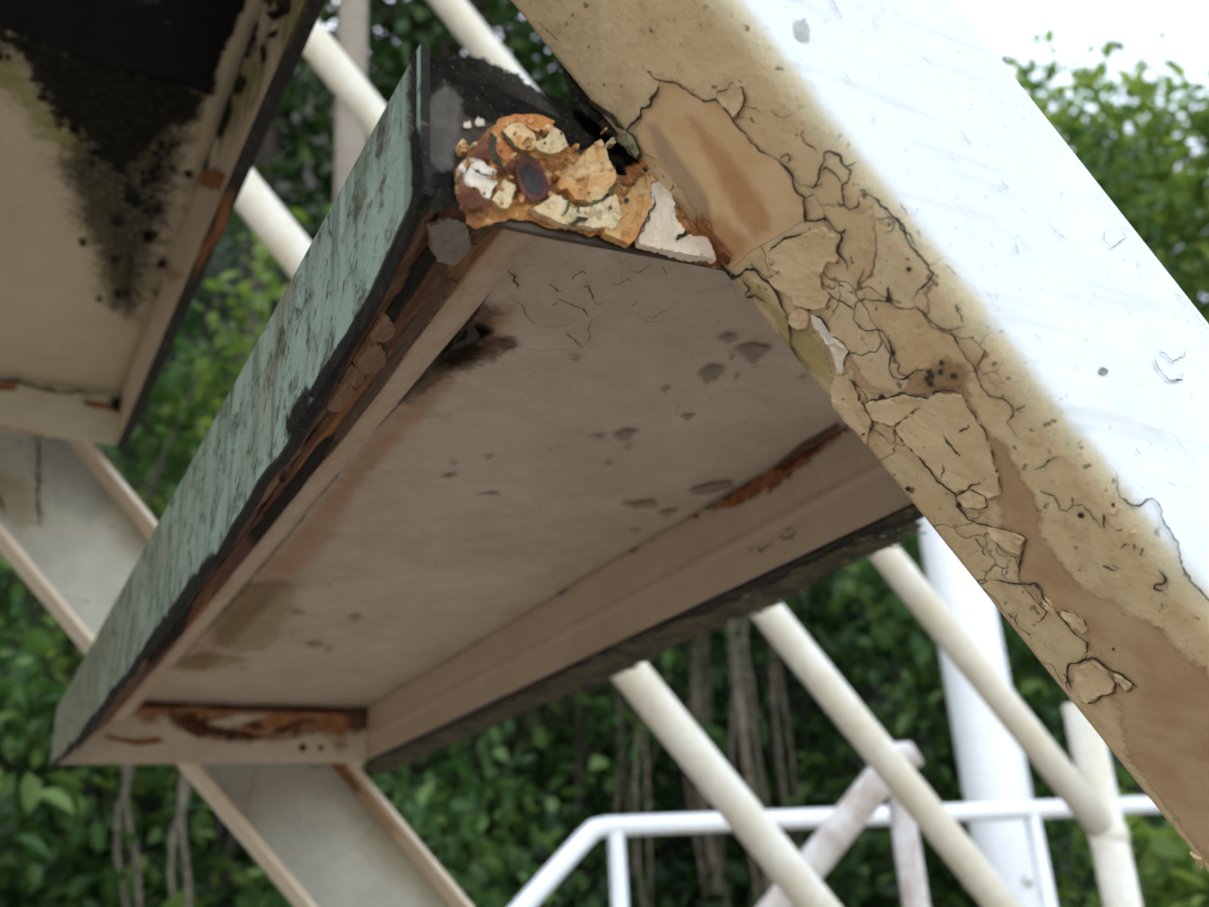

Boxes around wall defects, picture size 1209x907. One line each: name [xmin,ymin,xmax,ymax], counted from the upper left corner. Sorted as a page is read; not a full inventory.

leakage [0,0,304,319]
leakage [285,50,638,441]
crack [586,65,1026,439]
leakage [78,551,215,751]
corrosion [104,701,368,794]
corrosion [142,238,454,677]
corrosion [376,293,490,429]
corrosion [688,425,848,519]
crack [943,484,1089,681]
crack [1033,457,1102,528]
crack [1117,479,1209,601]